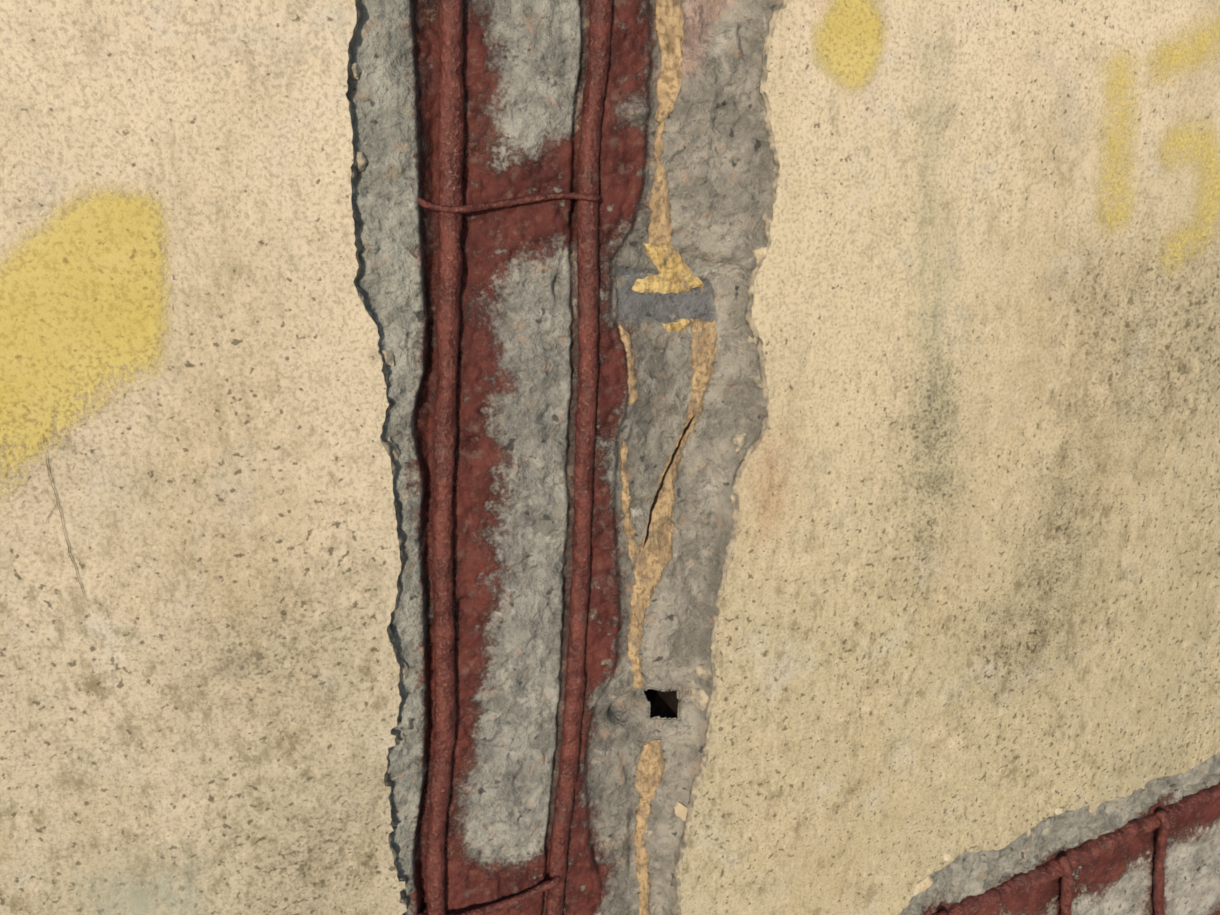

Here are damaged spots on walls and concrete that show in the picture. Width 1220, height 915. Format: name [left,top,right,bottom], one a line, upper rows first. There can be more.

spalling [346,0,440,915]
rust [404,0,440,915]
rust [445,4,583,915]
spalling [446,0,590,910]
rust [562,0,658,915]
crack [643,412,696,549]
spalling [563,0,789,915]
rust [923,898,955,915]
spalling [898,753,1220,915]
rust [982,794,1220,915]